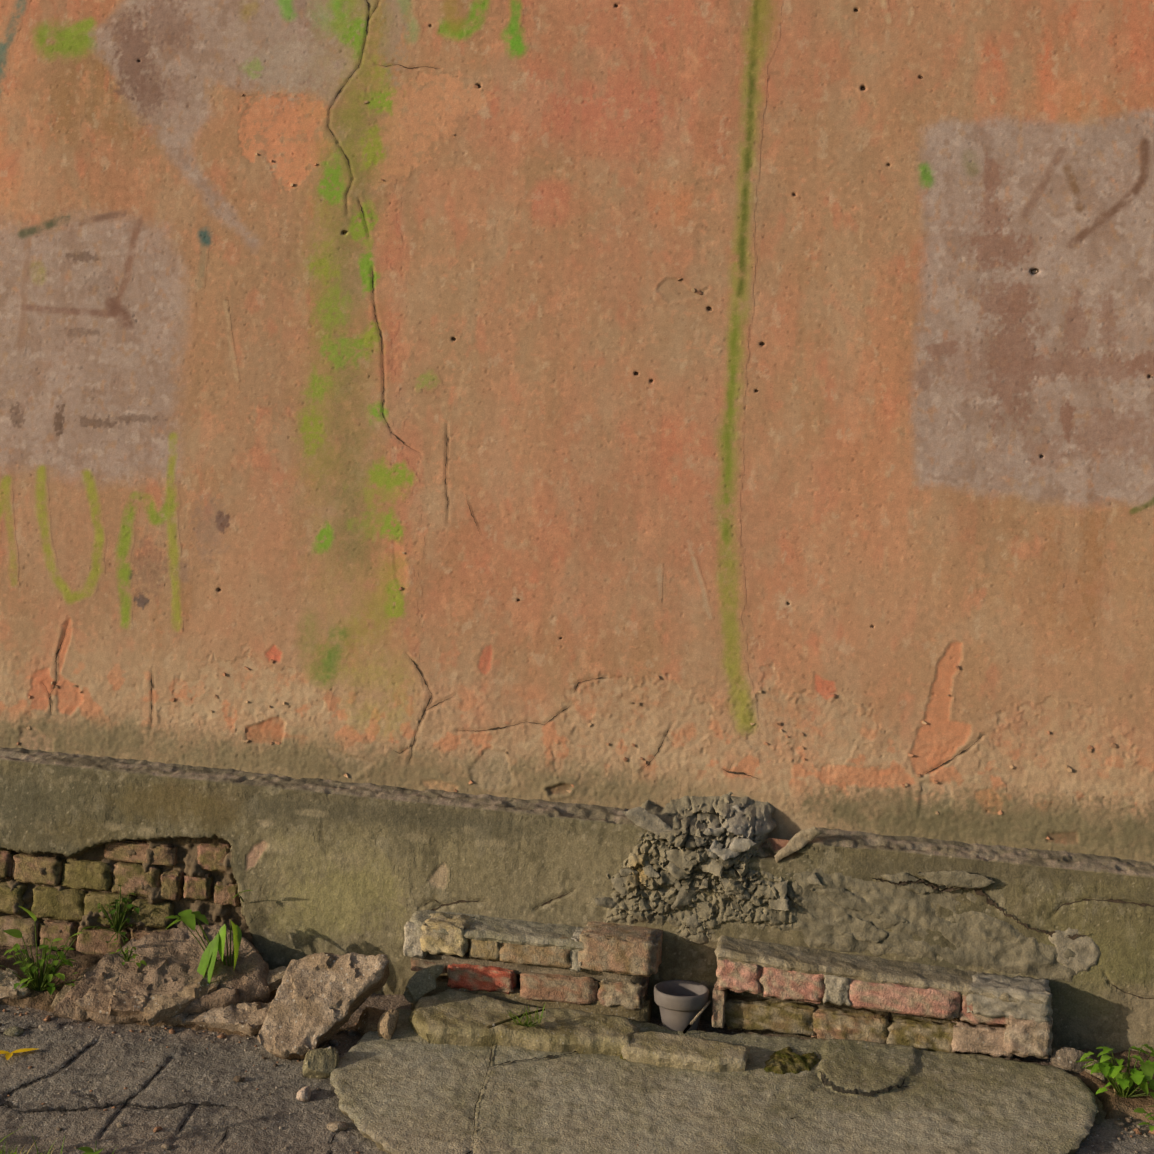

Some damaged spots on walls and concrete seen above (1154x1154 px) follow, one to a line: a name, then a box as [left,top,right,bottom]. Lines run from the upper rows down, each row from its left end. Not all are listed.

crack [328,0,433,230]
crack [372,269,480,534]
crack [393,655,453,758]
crack [456,677,603,732]
peeling [805,640,973,795]
spalling [0,834,263,955]
spalling [766,838,790,853]